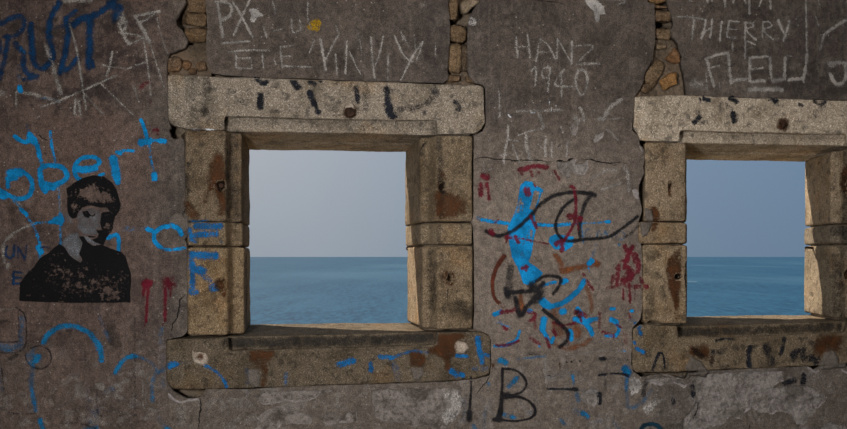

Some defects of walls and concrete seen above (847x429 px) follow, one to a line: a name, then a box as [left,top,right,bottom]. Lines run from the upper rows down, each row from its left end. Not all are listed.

corrosion [204,153,226,215]
corrosion [435,173,465,218]
crack [474,157,626,166]
corrosion [839,165,847,192]
corrosion [666,252,681,318]
flaking render [255,390,357,429]
flaking render [371,388,464,429]
flaking render [628,367,846,429]